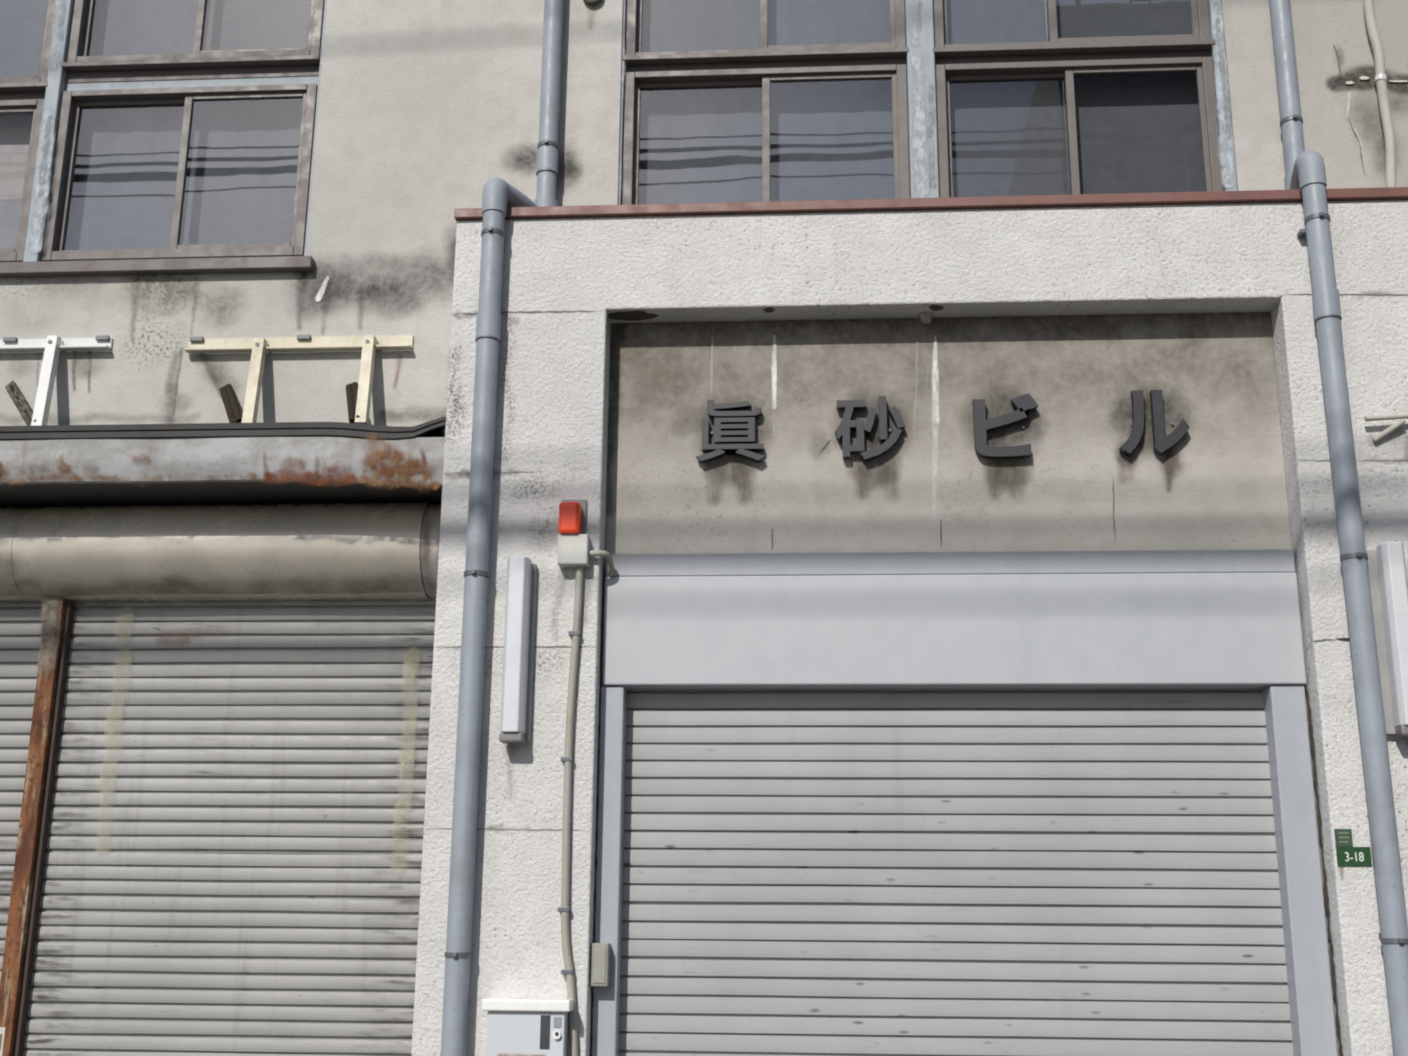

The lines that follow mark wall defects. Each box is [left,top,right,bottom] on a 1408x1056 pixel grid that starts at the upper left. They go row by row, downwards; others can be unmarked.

leakage [301,271,398,306]
leakage [915,337,940,440]
rust [241,436,440,490]